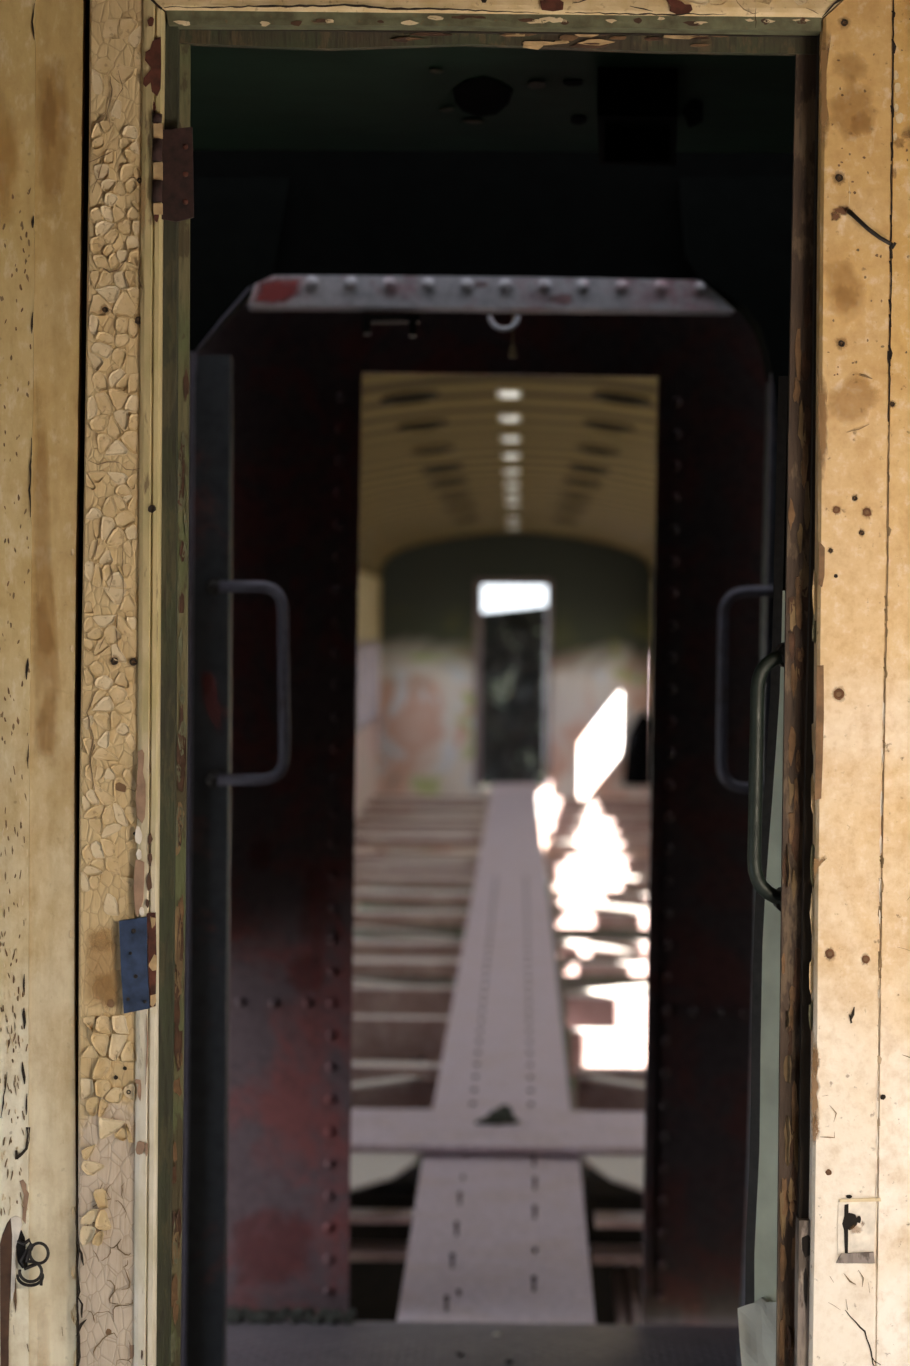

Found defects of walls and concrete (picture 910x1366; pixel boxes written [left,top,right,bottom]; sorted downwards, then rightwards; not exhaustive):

peeling [174,18,228,26]
crack [151,0,759,28]
peeling [401,0,569,26]
peeling [606,0,834,26]
crack [807,0,841,17]
crack [89,243,143,298]
rust [255,279,300,303]
peeling [71,18,153,917]
crack [95,535,124,650]
crack [828,0,910,1366]
crack [86,692,95,790]
peeling [70,999,148,1247]